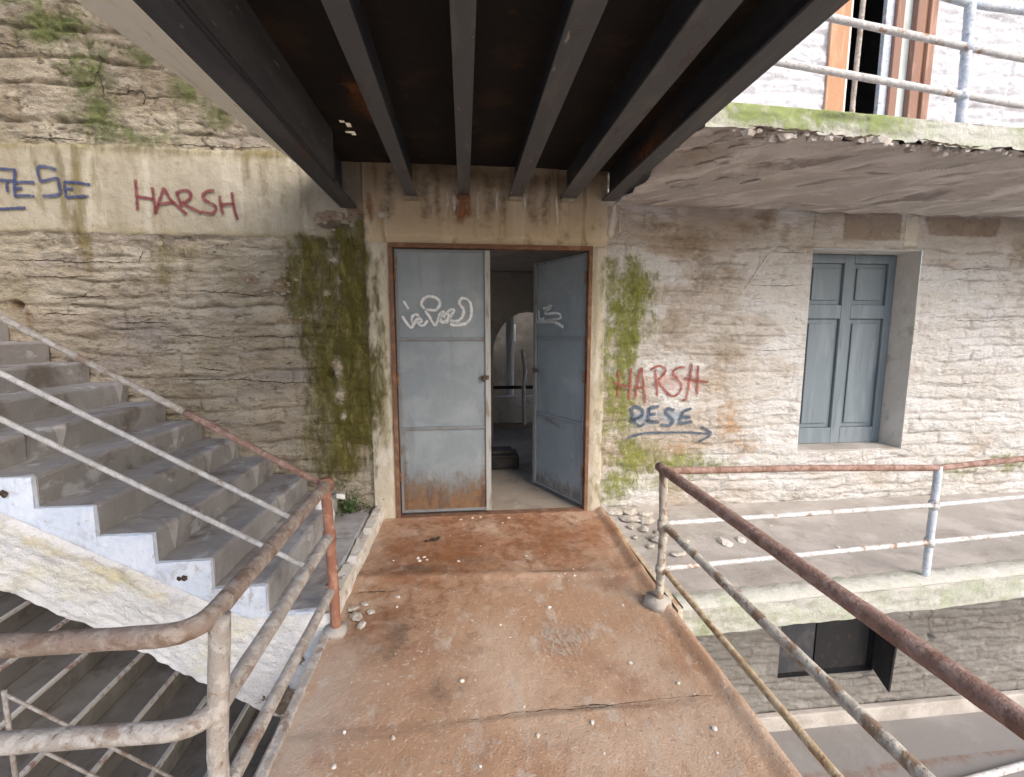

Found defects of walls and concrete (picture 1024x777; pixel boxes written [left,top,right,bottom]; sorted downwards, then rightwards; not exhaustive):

crack [70,55,177,104]
spalling [665,125,1024,190]
rust [404,480,486,521]
rust [381,534,483,585]
crack [460,695,713,722]